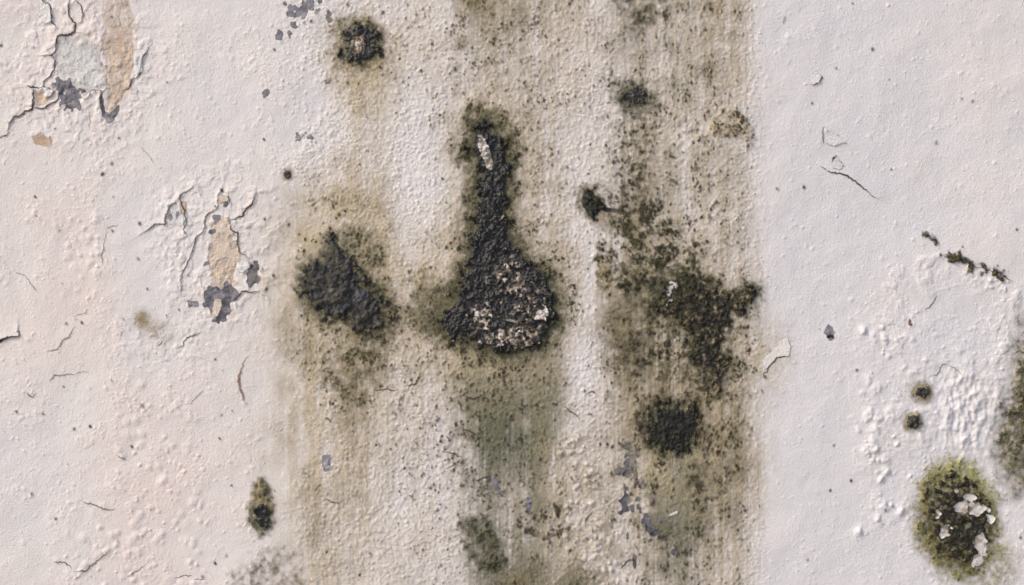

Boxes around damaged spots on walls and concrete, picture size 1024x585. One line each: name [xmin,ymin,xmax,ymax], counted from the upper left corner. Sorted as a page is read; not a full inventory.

peeling [8,0,147,129]
peeling [33,133,52,147]
crack [822,167,874,198]
peeling [144,188,261,324]
leakage [285,0,583,515]
leakage [578,0,768,585]
peeling [762,337,791,376]
leakage [903,383,932,430]
leakage [993,332,1024,497]
leakage [248,477,274,537]